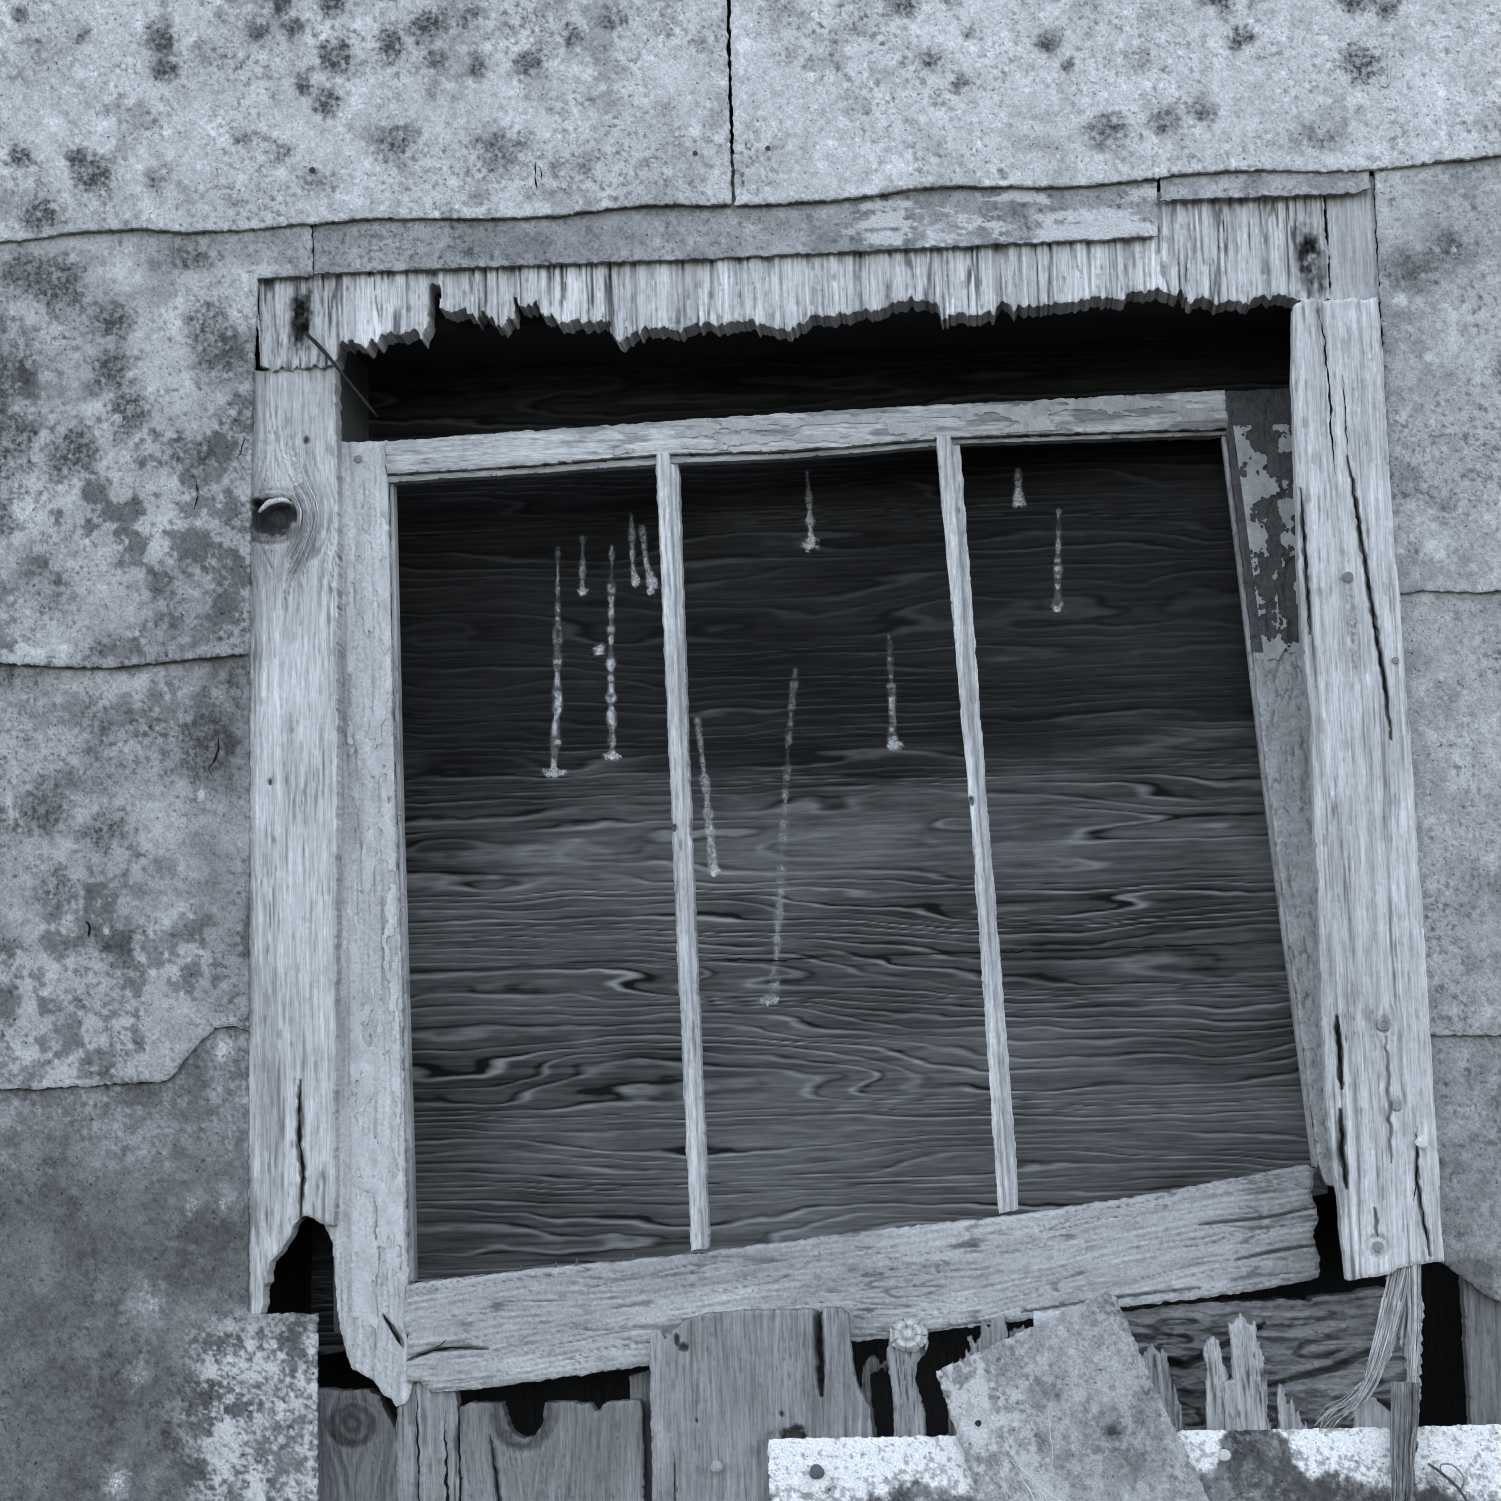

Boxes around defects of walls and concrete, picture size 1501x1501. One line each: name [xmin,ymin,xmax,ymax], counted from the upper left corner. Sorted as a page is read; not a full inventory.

leakage [296,39,351,117]
leakage [378,8,477,70]
leakage [1344,44,1383,84]
leakage [67,148,112,195]
leakage [0,304,150,479]
leakage [610,529,657,595]
leakage [803,480,815,552]
peeling [1233,424,1301,660]
crack [1300,488,1310,628]
crack [1317,311,1391,739]
leakage [546,660,567,777]
leakage [594,585,621,760]